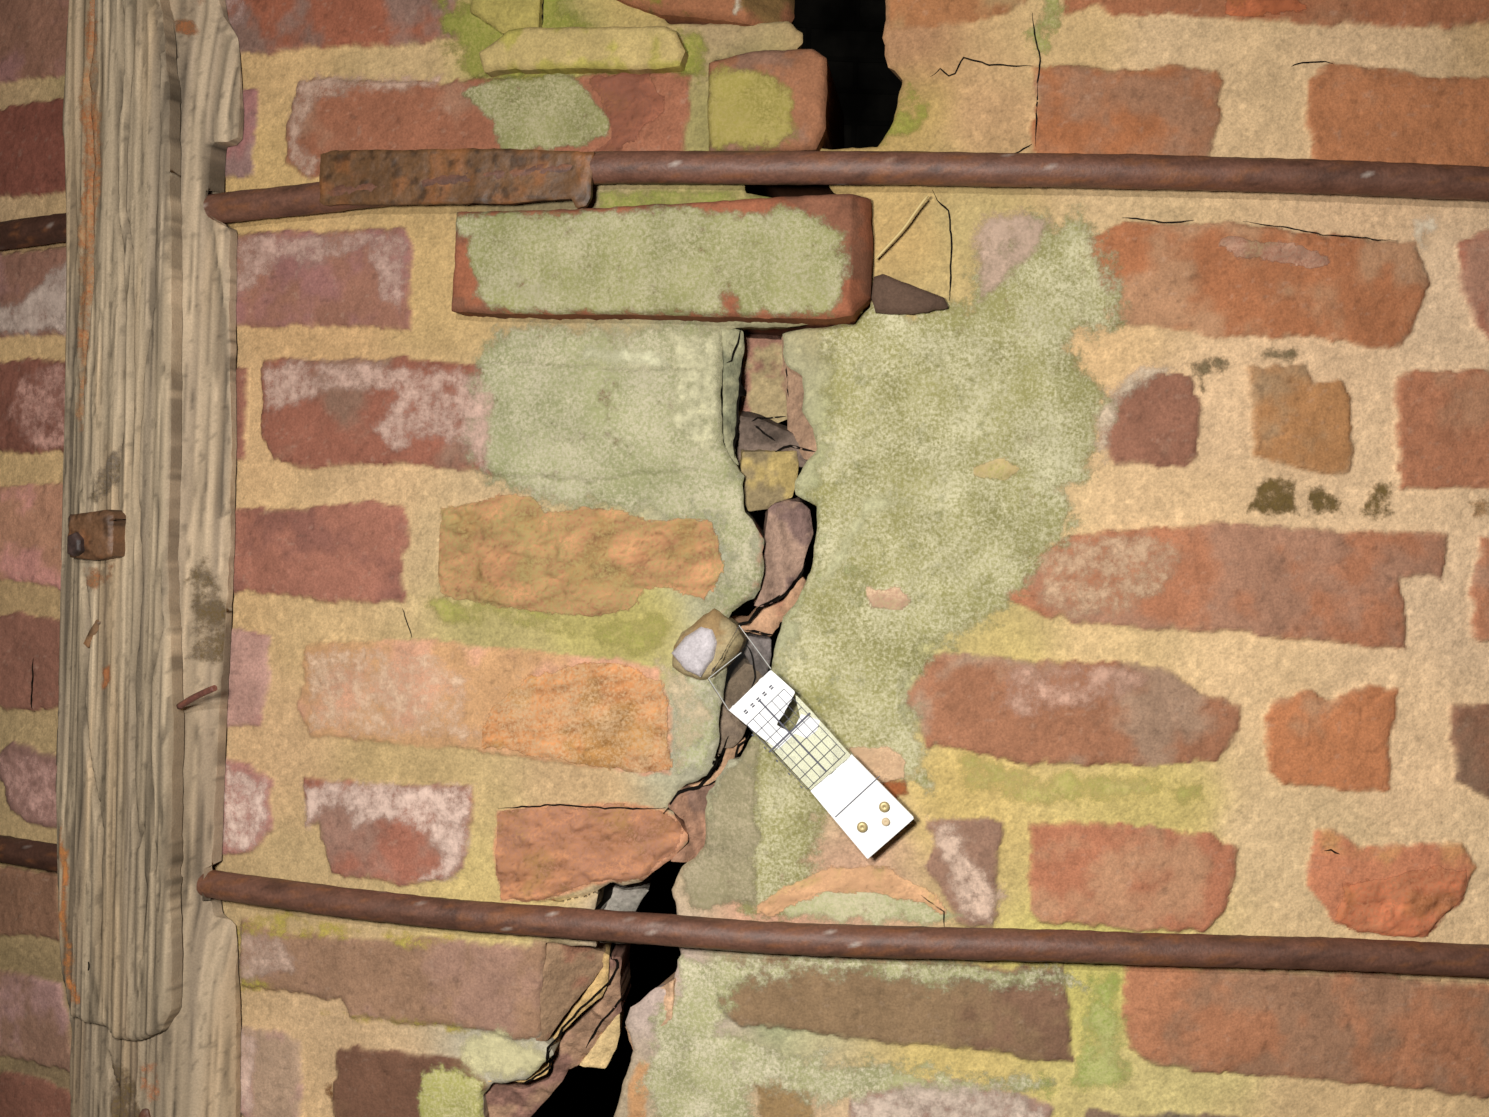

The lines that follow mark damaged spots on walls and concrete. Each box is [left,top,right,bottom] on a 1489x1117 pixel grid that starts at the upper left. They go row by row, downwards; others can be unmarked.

spalling [1225,0,1307,17]
spalling [589,72,665,151]
spalling [708,49,844,151]
crack [930,17,1041,153]
spalling [748,185,835,198]
leakage [973,213,1044,296]
leakage [582,331,722,449]
leakage [1041,536,1175,618]
crack [486,328,817,1117]
leakage [1006,664,1148,715]